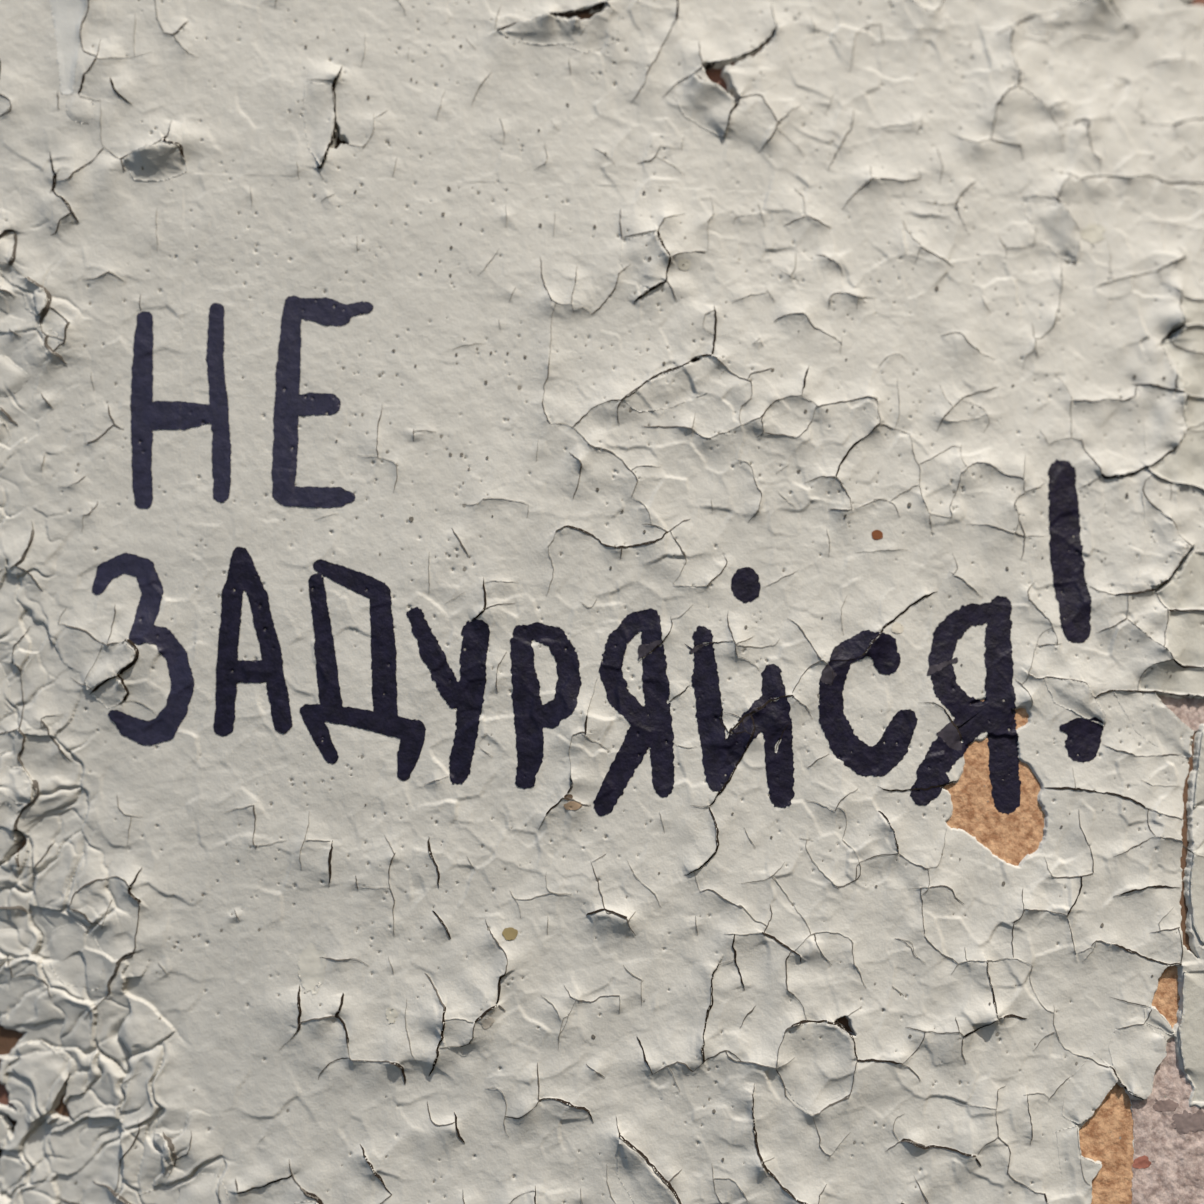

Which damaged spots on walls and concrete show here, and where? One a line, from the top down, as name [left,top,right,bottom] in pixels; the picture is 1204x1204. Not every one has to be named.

crack [49,0,200,235]
crack [297,42,389,202]
peeling [499,6,620,53]
peeling [673,43,785,136]
crack [0,229,122,444]
crack [0,520,42,590]
peeling [943,737,1045,866]
crack [68,797,166,1017]
crack [227,805,508,1144]
peeling [1190,842,1204,944]
peeling [6,1039,70,1123]
flaking render [1055,965,1204,1204]